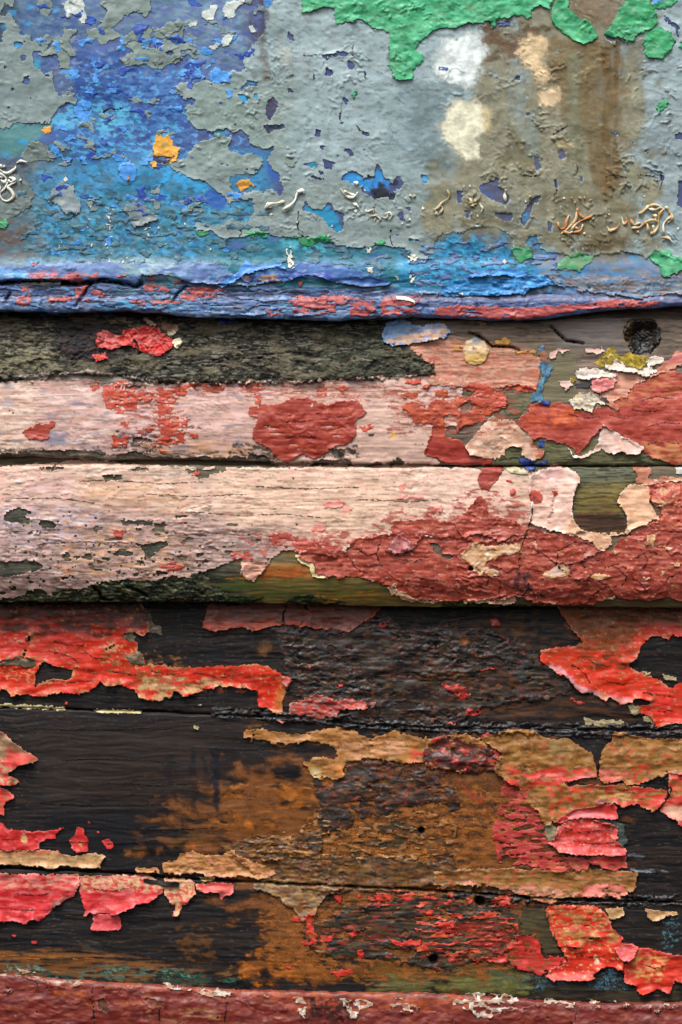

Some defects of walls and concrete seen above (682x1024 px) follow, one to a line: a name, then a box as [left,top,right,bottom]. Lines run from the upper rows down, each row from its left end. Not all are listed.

peeling [0,0,682,322]
peeling [0,283,682,995]
crack [476,504,546,598]
crack [556,541,678,596]